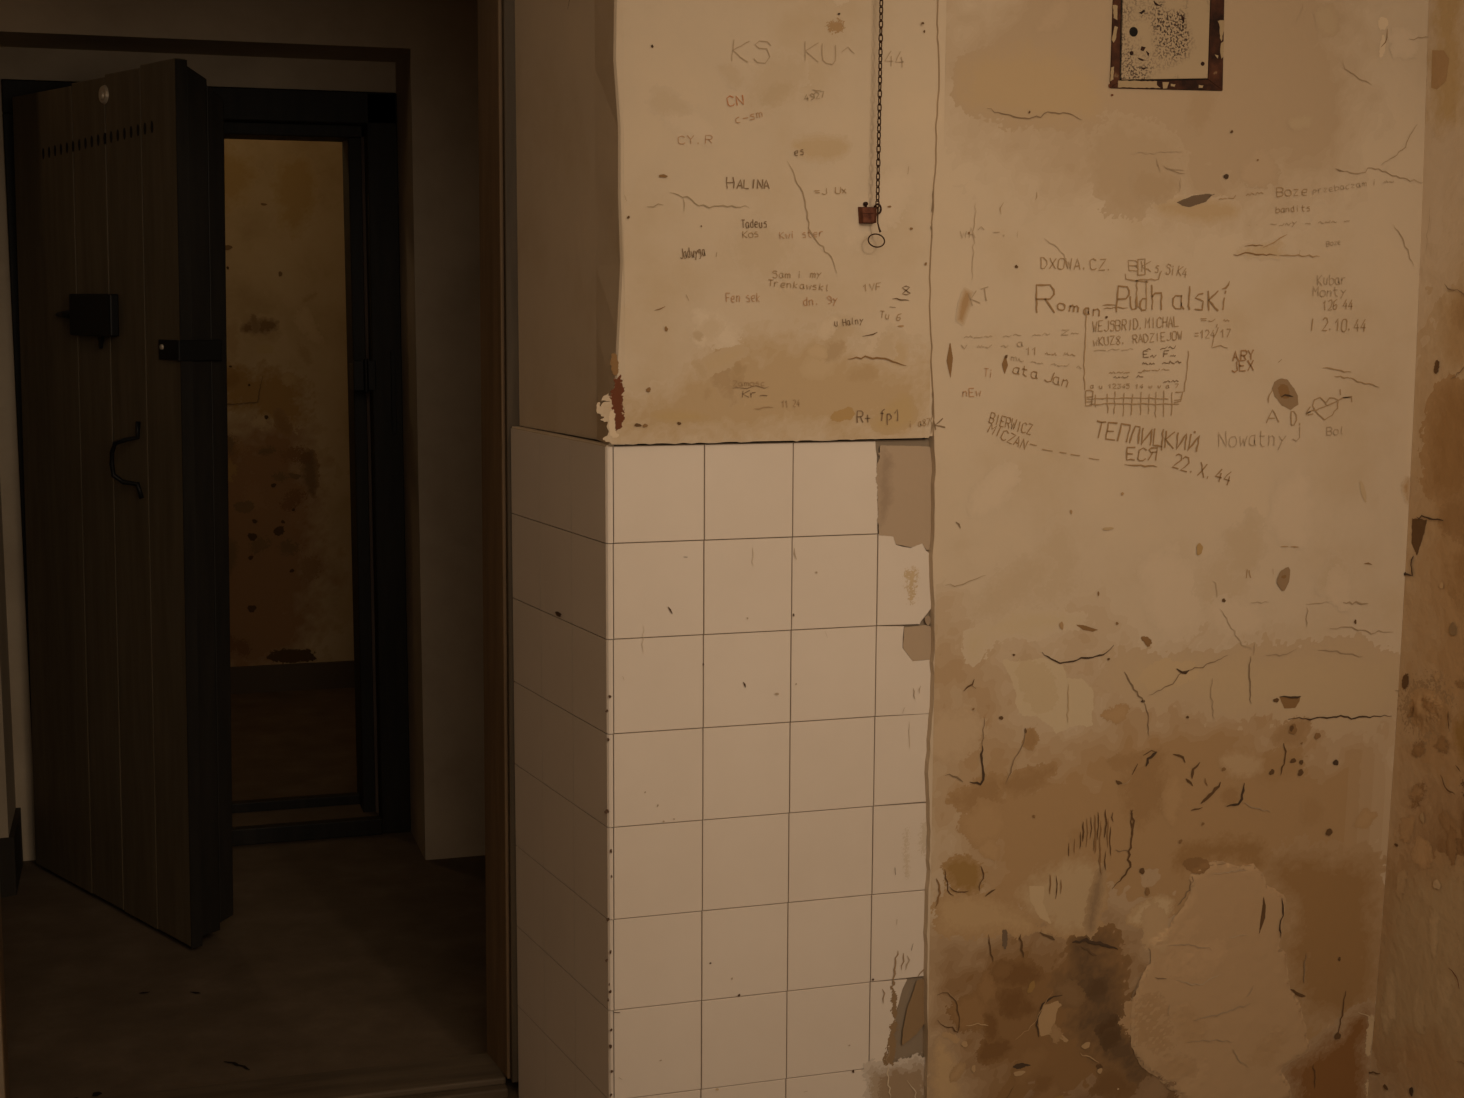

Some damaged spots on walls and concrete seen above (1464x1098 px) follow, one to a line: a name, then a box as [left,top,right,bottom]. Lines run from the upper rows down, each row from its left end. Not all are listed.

crack [1335,125,1430,262]
flaking render [610,353,619,375]
peeling [608,409,648,438]
peeling [879,445,932,550]
peeling [903,616,931,661]
crack [945,680,1026,785]
crack [1042,582,1398,889]
peeling [852,979,925,1098]